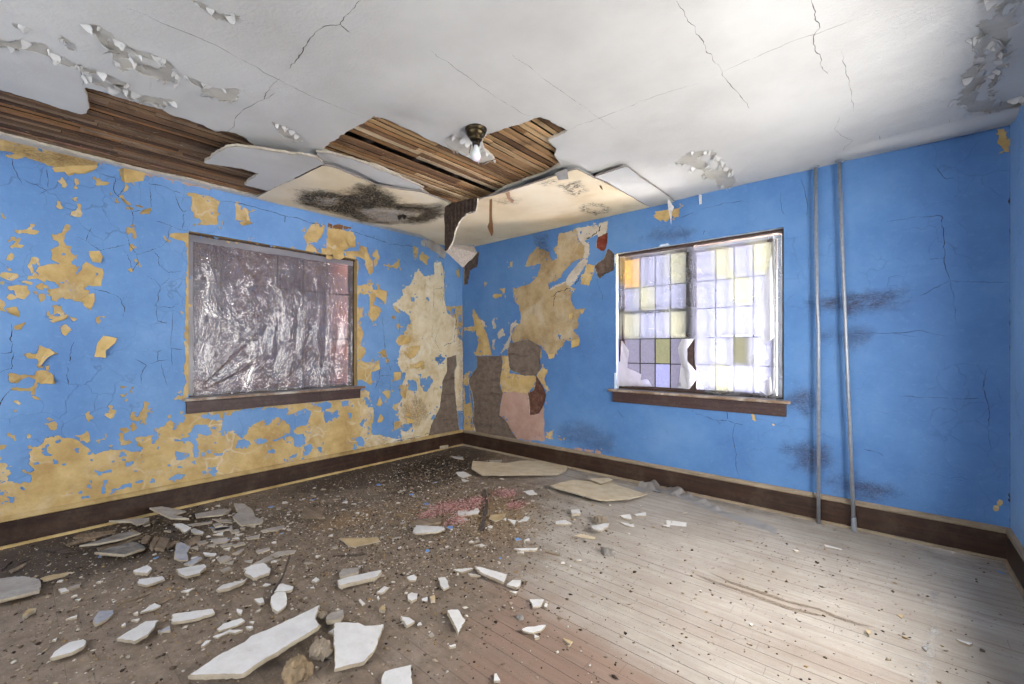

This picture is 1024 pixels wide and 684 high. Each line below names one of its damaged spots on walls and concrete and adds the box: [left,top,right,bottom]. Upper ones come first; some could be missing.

peeling [0,23,241,109]
peeling [193,0,239,25]
crack [127,1,359,131]
crack [676,0,771,108]
crack [794,0,854,150]
peeling [948,0,1024,117]
leakage [299,185,443,223]
peeling [675,150,737,190]
crack [86,174,187,381]
peeling [0,135,617,517]